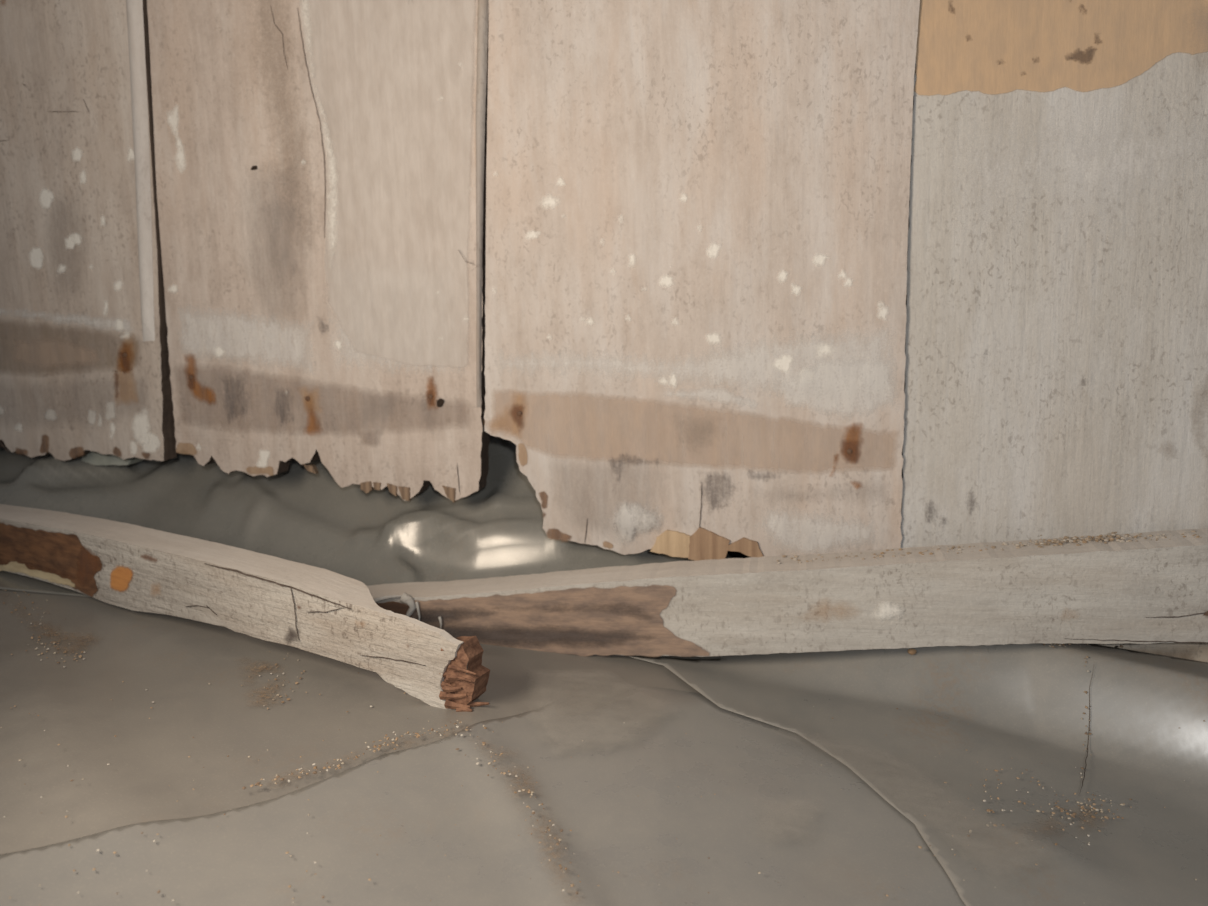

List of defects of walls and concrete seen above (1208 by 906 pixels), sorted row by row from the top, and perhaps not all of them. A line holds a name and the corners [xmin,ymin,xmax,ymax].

peeling [914,0,1208,95]
water stain [30,248,43,268]
water stain [66,234,81,249]
water stain [182,313,308,365]
water stain [496,303,893,470]
water stain [130,409,160,454]
spalling [176,443,197,455]
water stain [257,450,270,467]
corrosion [835,426,859,460]
spalling [360,481,412,501]
spalling [540,492,571,541]
spalling [650,527,764,561]